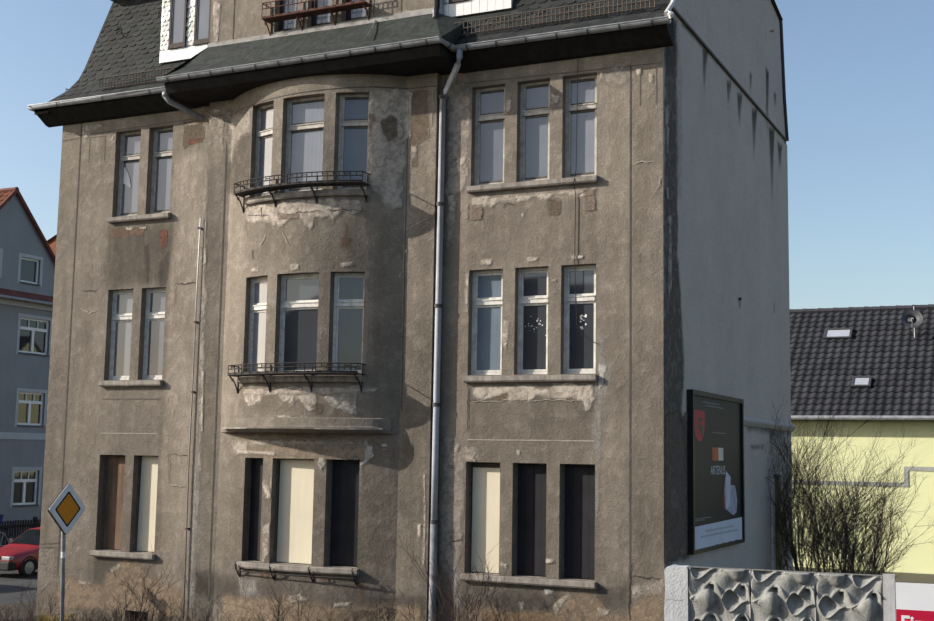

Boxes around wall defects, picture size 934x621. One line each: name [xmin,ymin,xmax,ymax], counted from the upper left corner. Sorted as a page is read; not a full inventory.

flaking render [367,88,428,209]
water stain [769,128,782,165]
flaking render [246,198,363,229]
water stain [664,24,684,539]
flaking render [244,385,377,417]
flaking render [471,383,595,411]